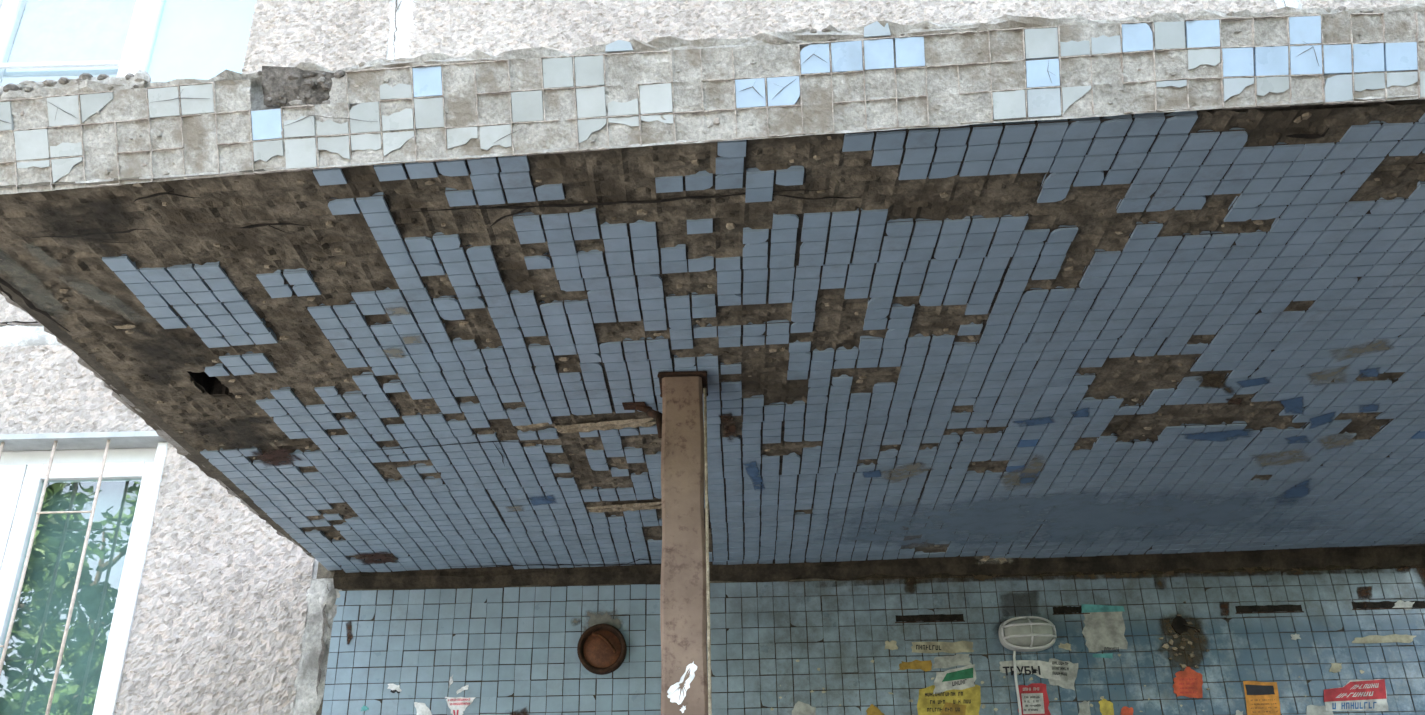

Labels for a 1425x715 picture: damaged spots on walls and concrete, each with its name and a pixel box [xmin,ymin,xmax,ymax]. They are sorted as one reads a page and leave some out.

spalling [1058,6,1425,147]
spalling [1348,153,1425,202]
spalling [0,26,1307,541]
spalling [1283,300,1314,312]
spalling [1355,372,1405,381]
spalling [1334,412,1393,440]
peeling [302,501,661,590]
peeling [704,507,1425,583]
spalling [1158,601,1209,671]